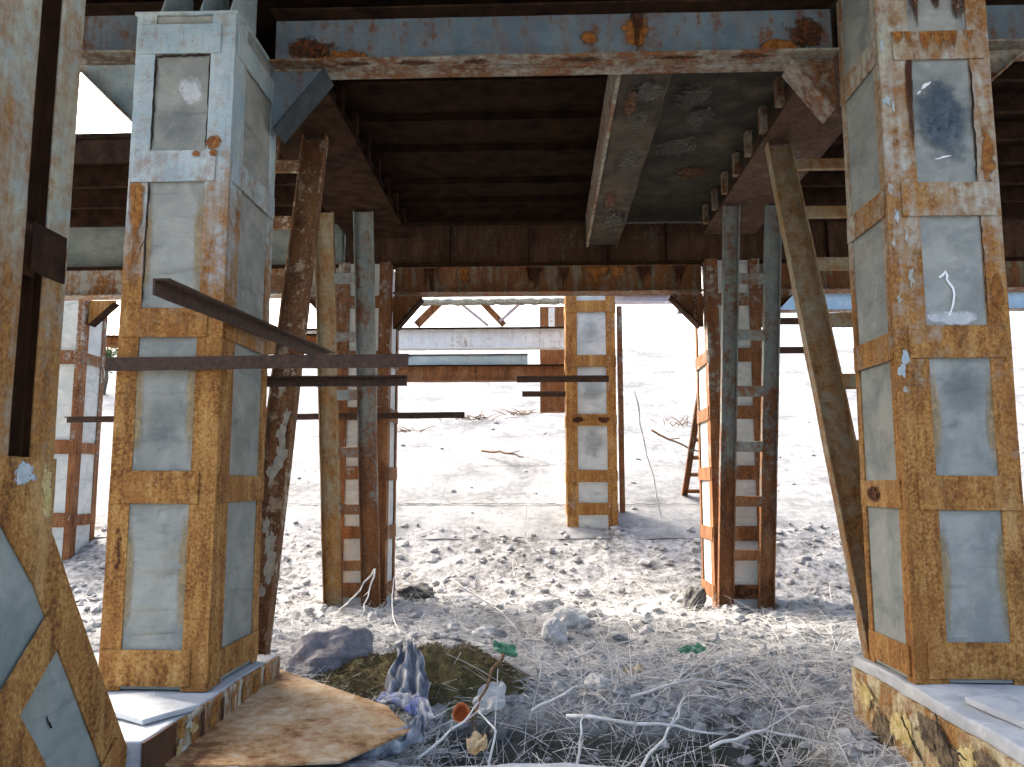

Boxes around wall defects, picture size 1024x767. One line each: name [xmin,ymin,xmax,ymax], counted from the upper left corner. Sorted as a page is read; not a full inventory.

rust [288,36,370,66]
rust [561,31,599,62]
rust [621,13,649,48]
rust [731,16,824,59]
leakage [180,82,201,104]
leakage [916,83,967,152]
rust [192,136,221,157]
peeling [897,349,910,392]
peeling [266,409,291,487]
peeling [14,460,52,521]
rust [867,486,880,501]
peeling [259,516,277,598]